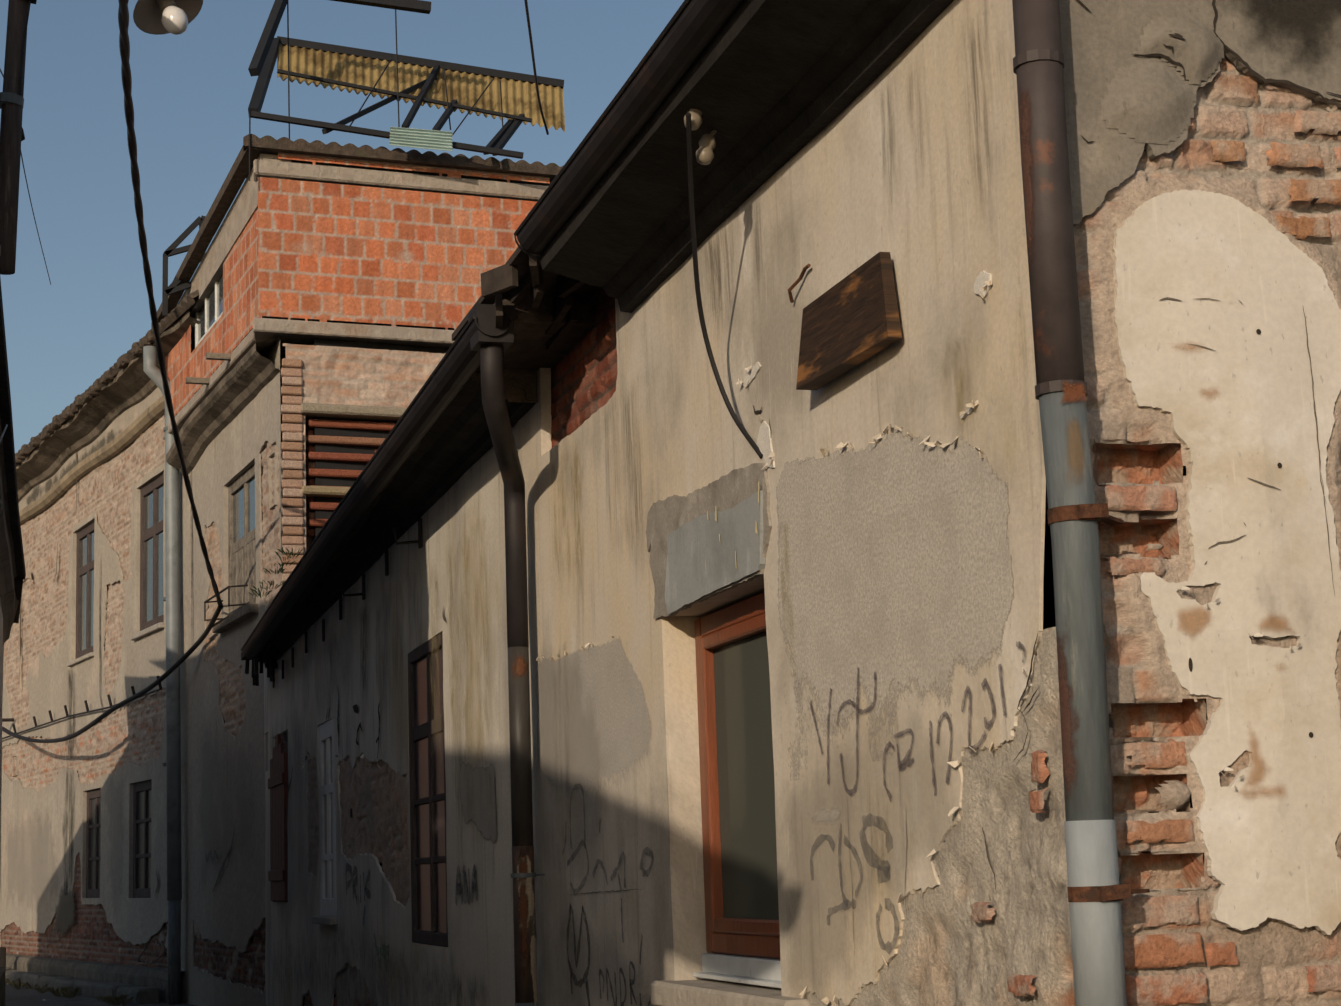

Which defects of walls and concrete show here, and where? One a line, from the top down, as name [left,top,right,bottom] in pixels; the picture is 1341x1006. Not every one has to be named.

crack [1212,0,1341,100]
rust [1019,92,1033,250]
rust [1062,383,1086,402]
spalling [1073,54,1341,1006]
spalling [300,752,319,876]
spalling [799,627,1075,1006]
spalling [0,853,168,968]
spalling [194,918,266,992]
rust [517,855,538,1006]